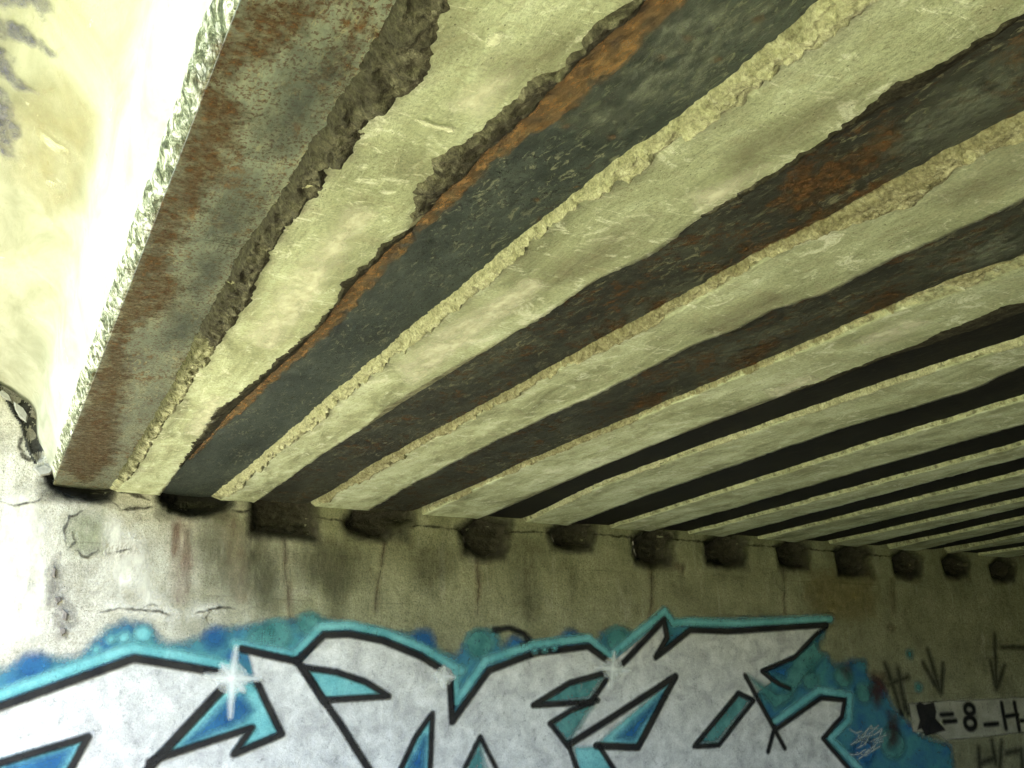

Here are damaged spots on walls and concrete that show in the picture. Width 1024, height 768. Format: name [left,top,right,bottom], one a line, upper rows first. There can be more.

rust [58,0,323,483]
spalling [42,0,450,558]
rust [189,0,685,459]
spalling [157,0,1024,541]
rust [737,131,894,251]